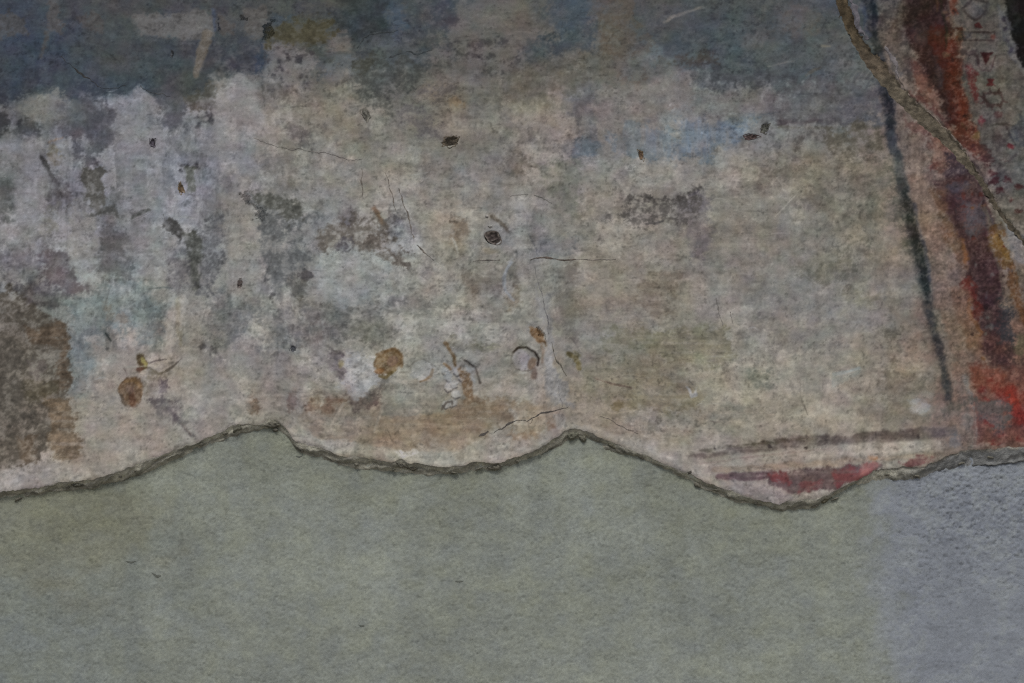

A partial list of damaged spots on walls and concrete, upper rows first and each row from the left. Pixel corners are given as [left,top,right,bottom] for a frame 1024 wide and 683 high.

crack [836,0,1024,245]
crack [479,257,616,436]
spalling [0,419,1024,511]